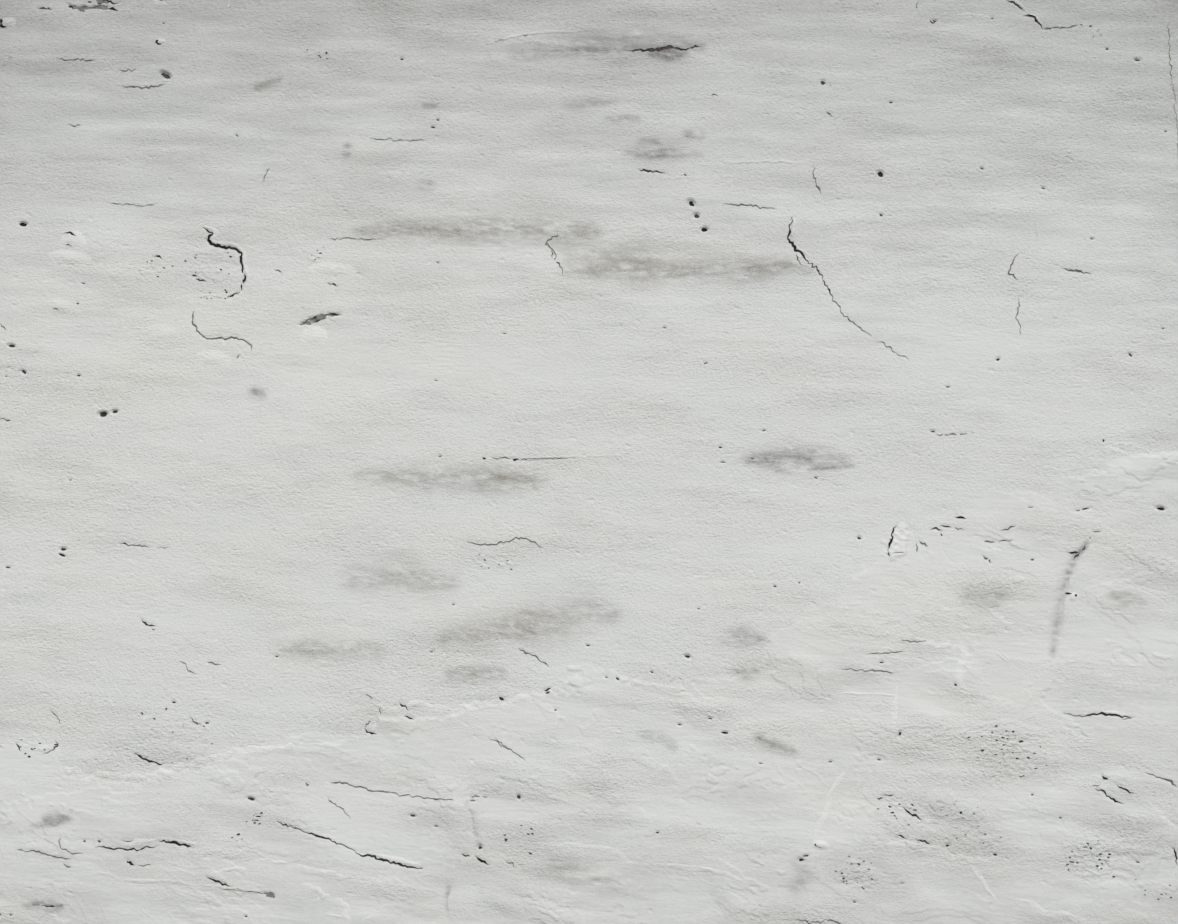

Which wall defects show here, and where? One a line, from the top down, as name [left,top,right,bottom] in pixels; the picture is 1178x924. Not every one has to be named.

crack [1008,0,1076,29]
crack [202,226,249,297]
crack [725,203,908,358]
crack [192,311,252,357]
crack [306,781,484,816]
crack [16,838,195,867]
crack [255,816,421,869]
crack [206,867,266,894]